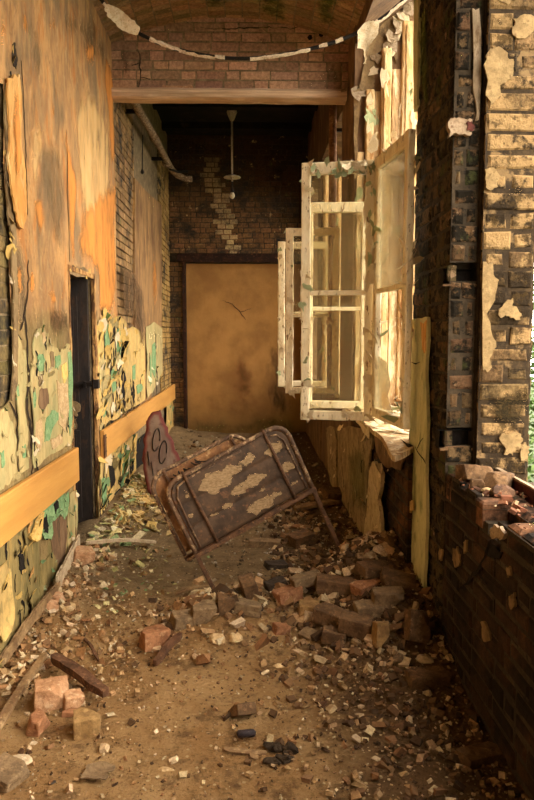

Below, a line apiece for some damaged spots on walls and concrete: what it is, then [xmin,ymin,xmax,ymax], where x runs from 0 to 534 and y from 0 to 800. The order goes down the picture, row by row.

peeling [0,42,81,491]